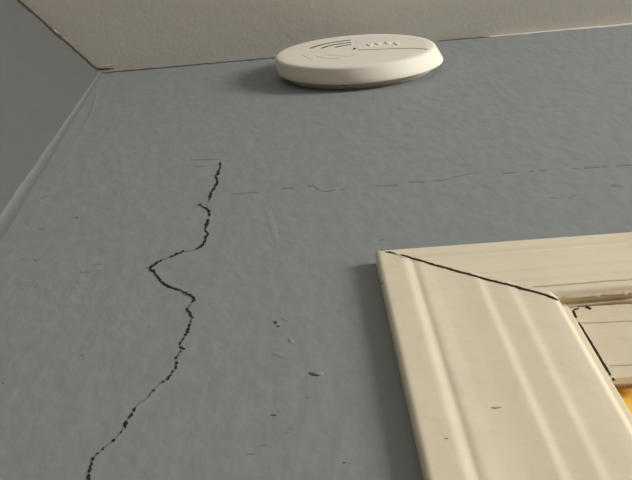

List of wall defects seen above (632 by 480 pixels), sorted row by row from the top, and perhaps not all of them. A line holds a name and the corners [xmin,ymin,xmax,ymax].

crack [87,159,258,480]